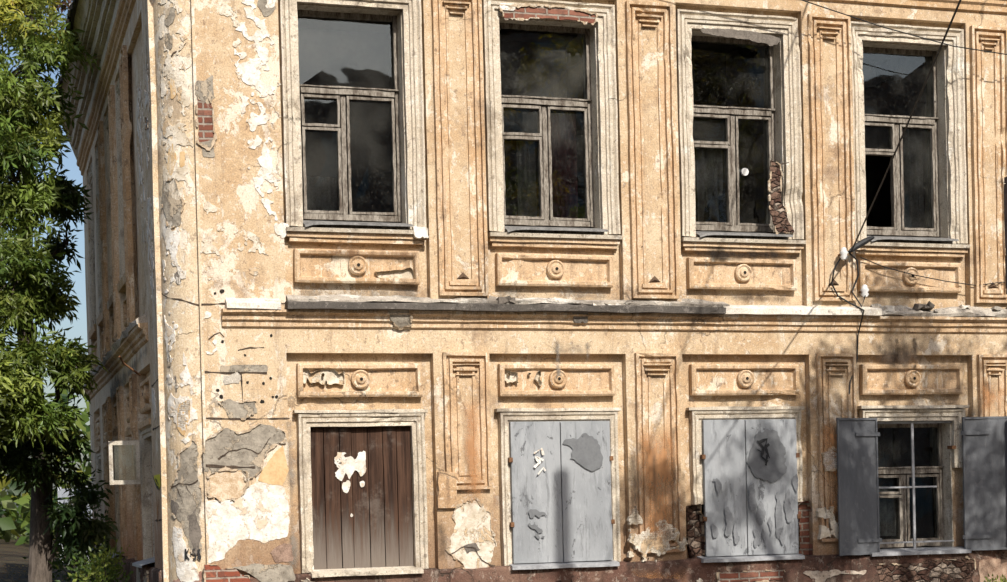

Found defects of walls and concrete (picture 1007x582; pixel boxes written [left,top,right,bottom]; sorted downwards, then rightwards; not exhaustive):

spalling [499,3,598,26]
peeling [136,0,218,300]
peeling [219,0,289,238]
spalling [767,160,795,234]
peeling [217,225,268,255]
peeling [300,368,345,385]
peeling [164,312,312,582]
peeling [446,496,497,569]
peeling [556,478,740,582]
flaking render [716,569,785,582]
peeling [748,474,839,555]
spalling [803,556,1007,582]